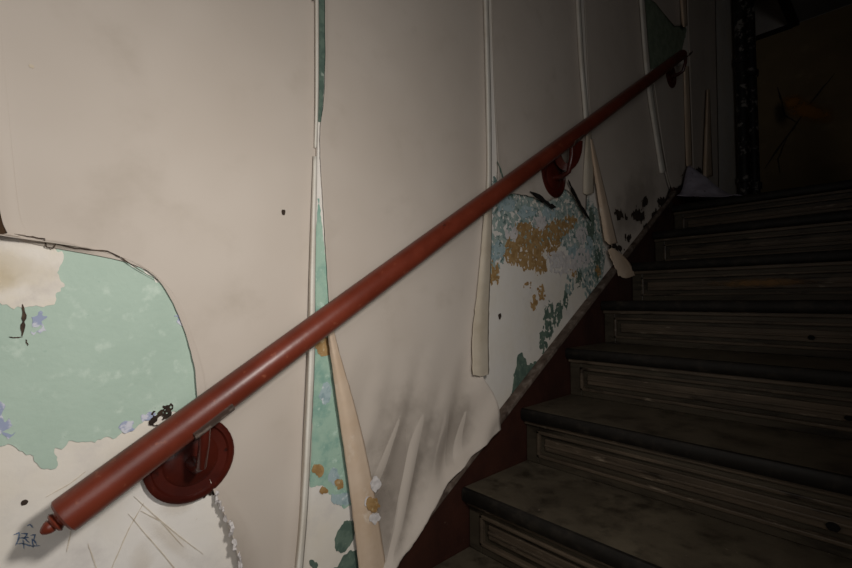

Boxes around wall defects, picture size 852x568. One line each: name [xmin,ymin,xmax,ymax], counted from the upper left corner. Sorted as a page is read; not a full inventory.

peeling [645,0,687,69]
peeling [315,198,329,312]
peeling [490,189,606,393]
peeling [0,235,197,469]
peeling [309,336,351,509]
spalling [215,491,243,568]
peeling [334,520,359,568]
peeling [364,476,382,525]